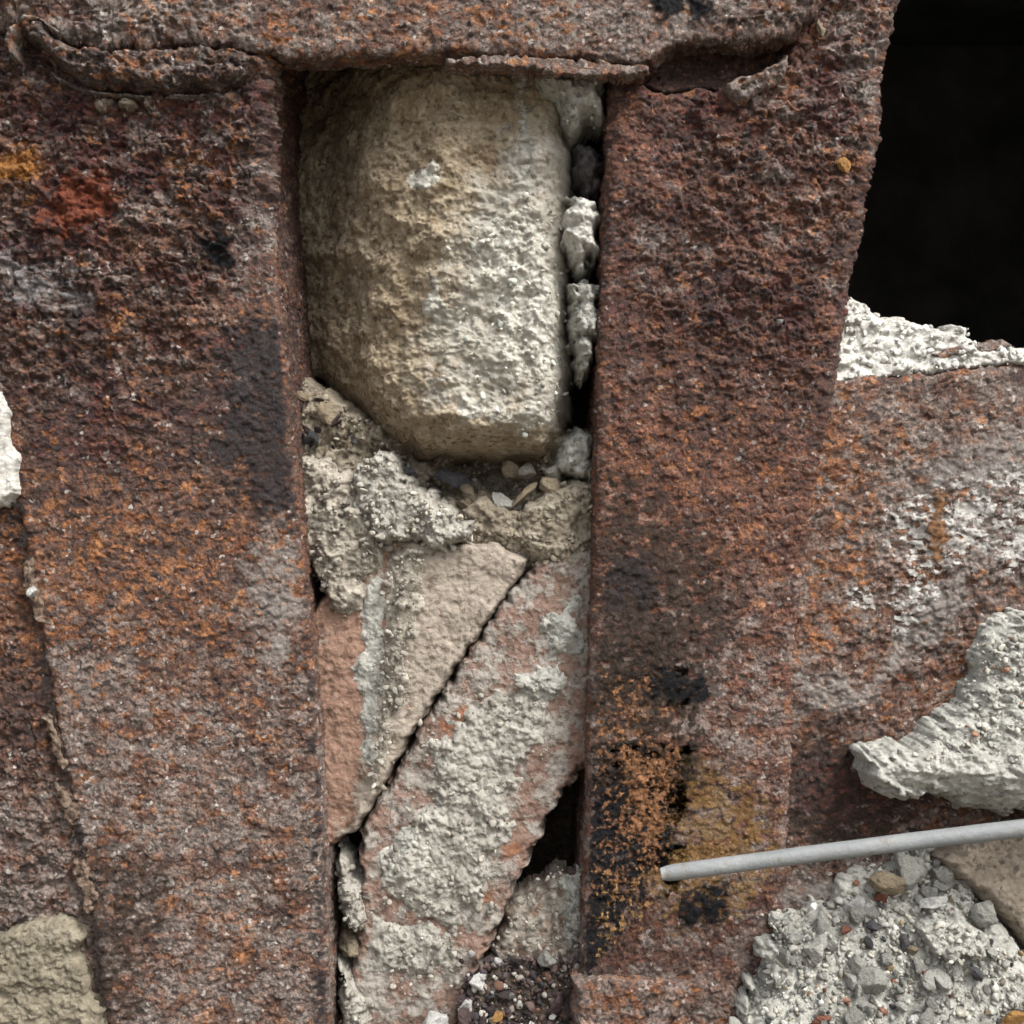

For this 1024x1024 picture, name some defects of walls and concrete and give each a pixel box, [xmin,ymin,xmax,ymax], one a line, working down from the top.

rust [816,19,826,38]
rust [445,54,650,85]
rust [94,96,156,116]
rust [0,146,40,187]
rust [836,157,851,173]
rust [922,490,952,578]
peeling [514,595,730,976]
rust [786,731,921,845]